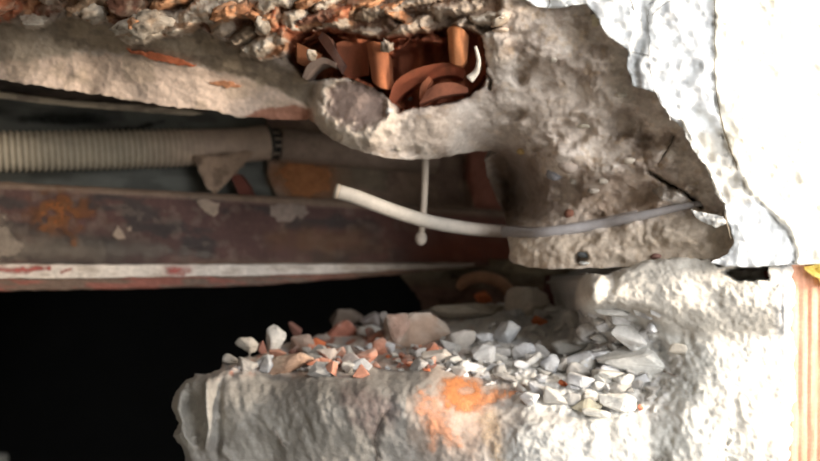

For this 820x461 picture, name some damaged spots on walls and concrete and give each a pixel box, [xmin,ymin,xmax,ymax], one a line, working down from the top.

spalling [0,0,734,270]
crack [630,0,701,209]
crack [706,166,731,238]